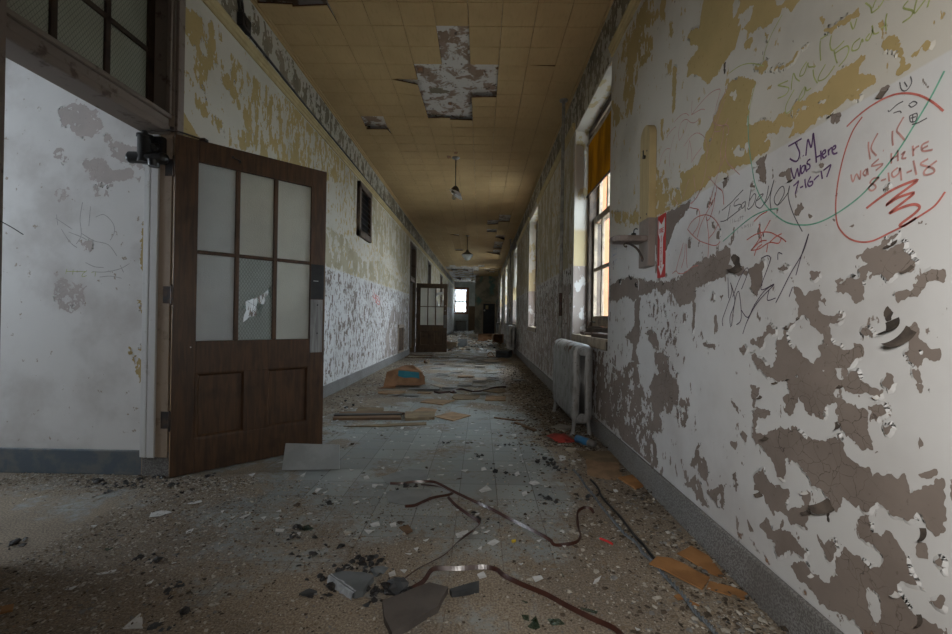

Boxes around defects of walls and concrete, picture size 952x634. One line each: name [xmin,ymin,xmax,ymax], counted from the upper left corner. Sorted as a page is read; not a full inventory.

peeling [183,4,454,381]
peeling [498,0,674,376]
peeling [655,0,890,259]
peeling [881,35,936,76]
peeling [128,344,141,383]
peeling [592,228,792,468]
peeling [684,443,738,510]
peeling [730,230,949,634]